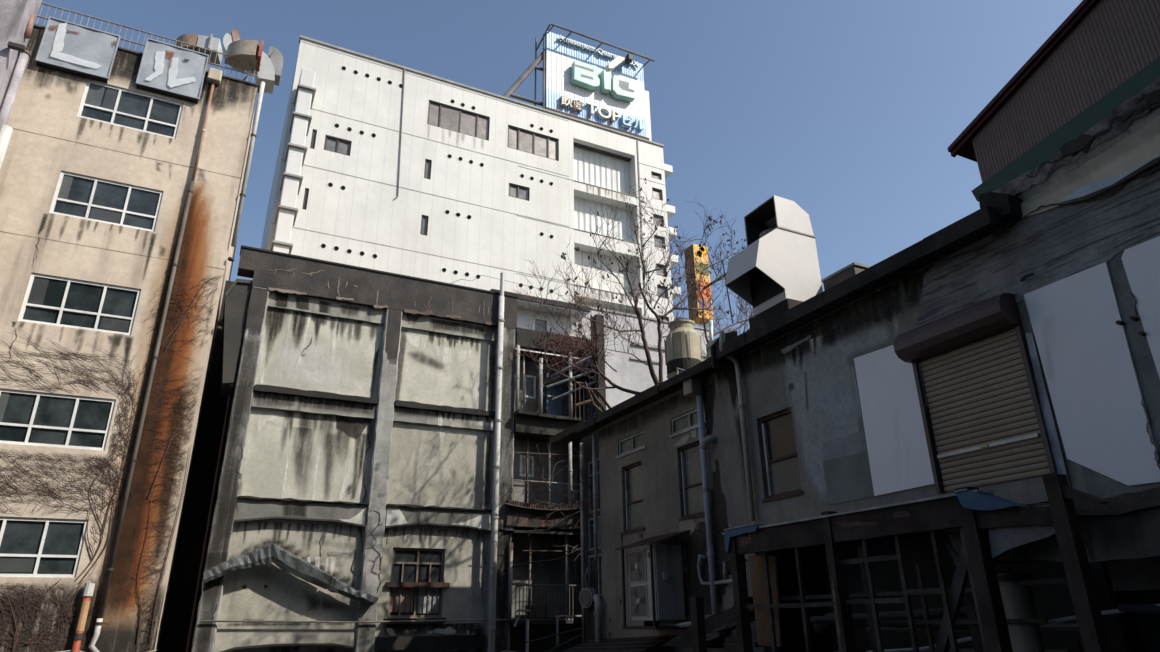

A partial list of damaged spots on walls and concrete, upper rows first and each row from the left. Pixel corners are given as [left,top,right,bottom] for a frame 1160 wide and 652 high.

spalling [992,77,1160,197]
crack [1020,165,1160,219]
crack [1026,89,1160,178]
corrosion [107,190,207,617]
damp [244,522,361,541]
damp [247,307,377,500]
crack [351,440,388,594]
damp [406,332,479,372]
damp [437,412,494,505]
damp [598,263,936,456]